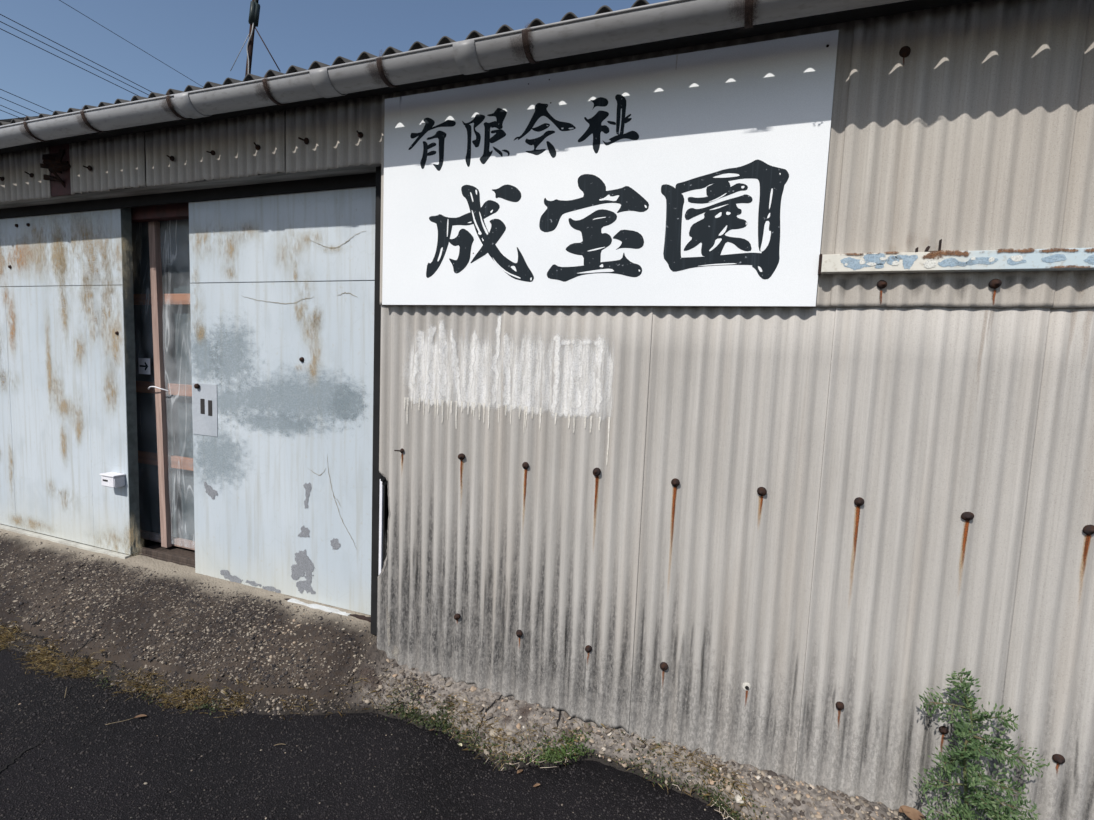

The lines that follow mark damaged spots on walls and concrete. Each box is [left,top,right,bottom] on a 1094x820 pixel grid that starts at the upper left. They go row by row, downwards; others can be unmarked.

corrosion [0,233,65,274]
corrosion [75,227,119,328]
peeling [840,253,1026,270]
corrosion [59,401,81,455]
peeling [303,483,311,508]
peeling [291,526,316,594]
corrosion [961,521,969,565]